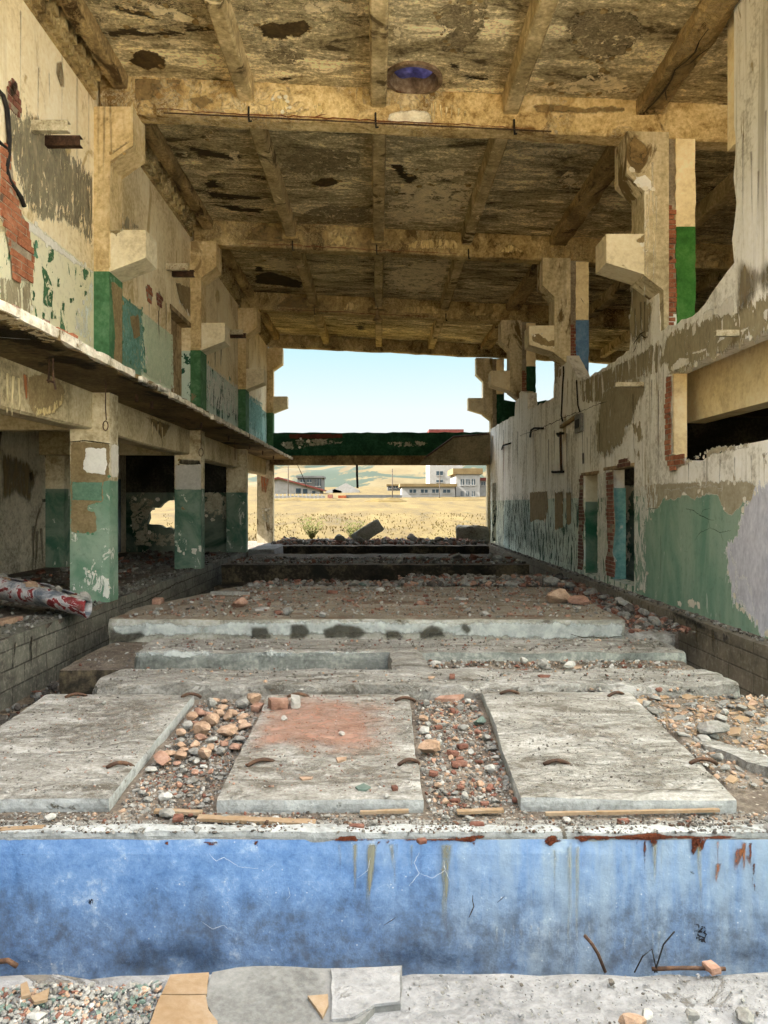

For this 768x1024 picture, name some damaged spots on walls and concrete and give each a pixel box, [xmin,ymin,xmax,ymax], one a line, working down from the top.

peeling [108,0,214,71]
spalling [253,1,364,41]
flaking render [6,78,22,118]
leakage [10,110,92,241]
flaking render [0,143,93,343]
peeling [70,442,119,542]
peeling [505,286,768,642]
peeling [73,570,112,598]
leakage [353,844,376,893]
leakage [442,845,451,900]
corrosion [545,835,561,846]
corrosion [574,833,755,891]